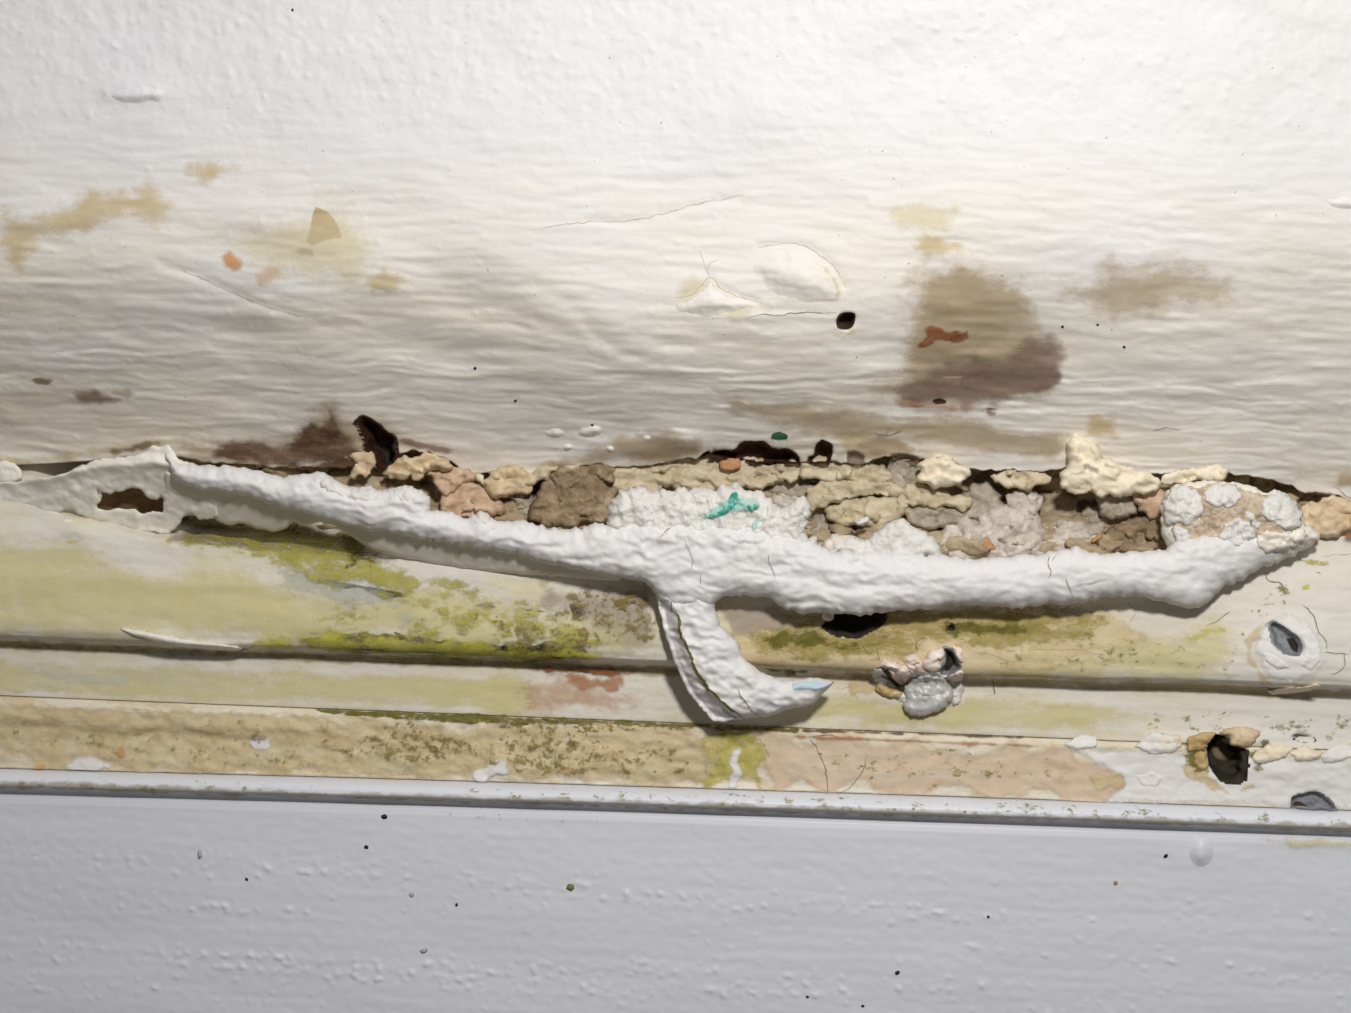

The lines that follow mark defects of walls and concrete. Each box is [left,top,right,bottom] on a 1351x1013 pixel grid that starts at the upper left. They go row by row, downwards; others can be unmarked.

damp [2,190,159,262]
damp [733,272,1062,457]
damp [1090,417,1111,433]
spalling [0,415,1351,559]
damp [546,591,649,643]
spalling [1157,726,1323,770]